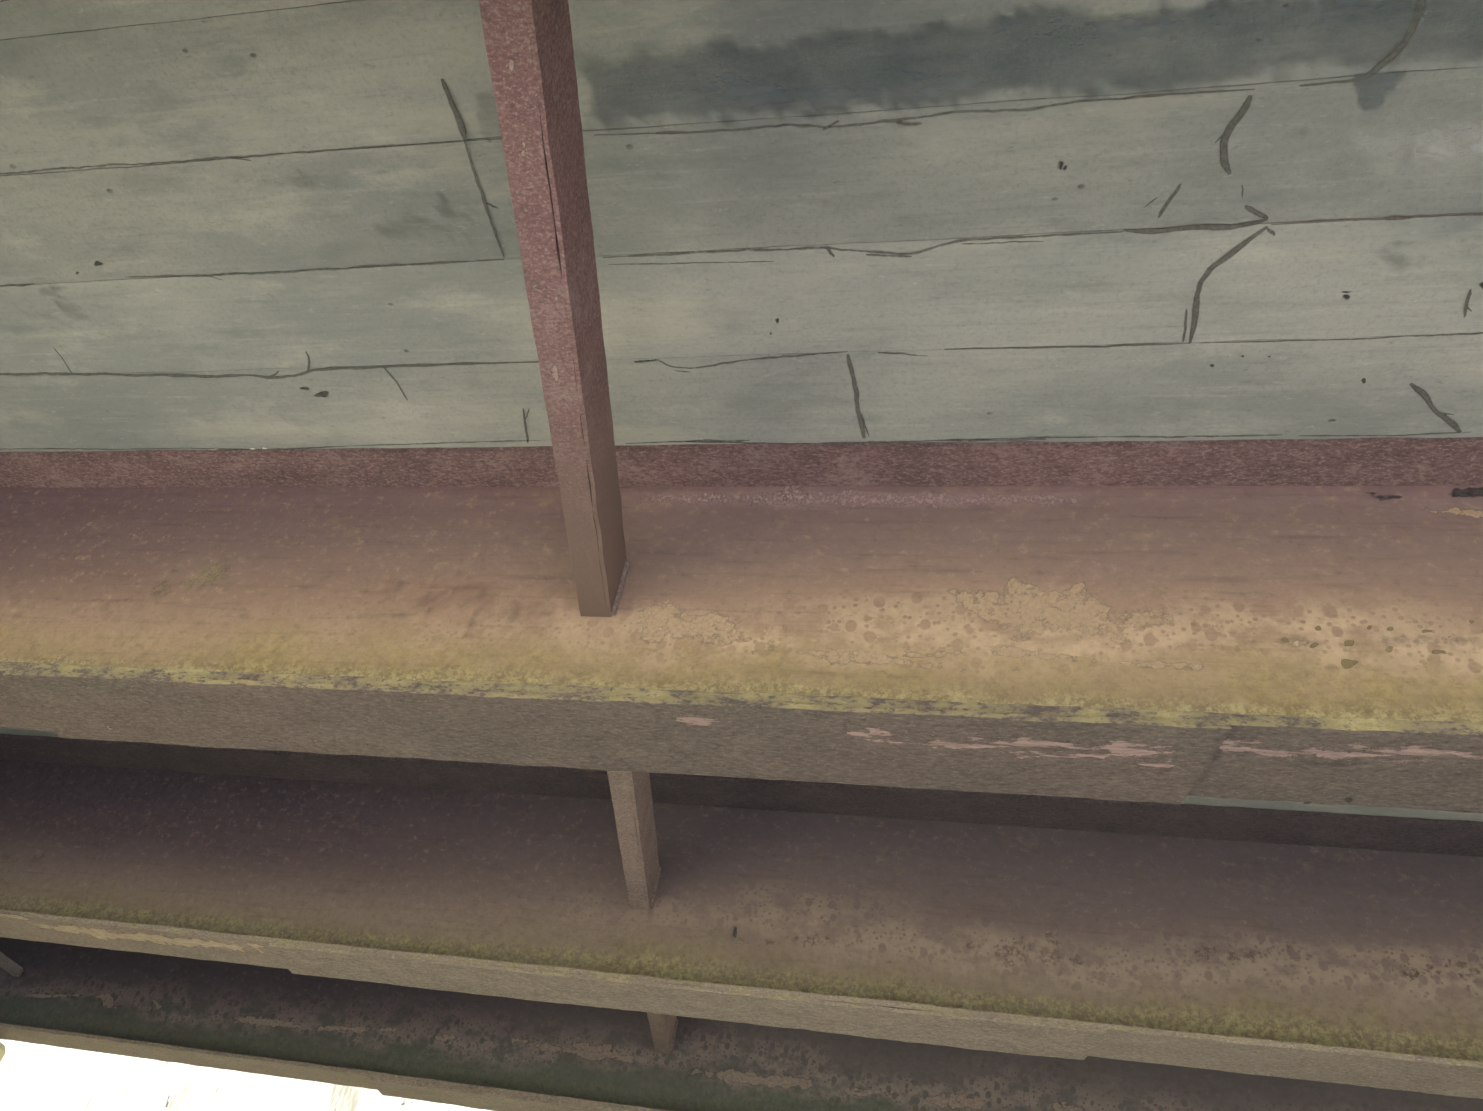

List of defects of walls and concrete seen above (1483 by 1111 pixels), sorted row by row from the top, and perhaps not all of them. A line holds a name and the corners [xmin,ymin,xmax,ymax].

crack [1299,0,1424,86]
crack [0,79,504,280]
crack [0,280,34,288]
crack [601,89,1483,444]
peeling [665,713,720,726]
peeling [846,728,1176,768]
peeling [1219,739,1483,765]